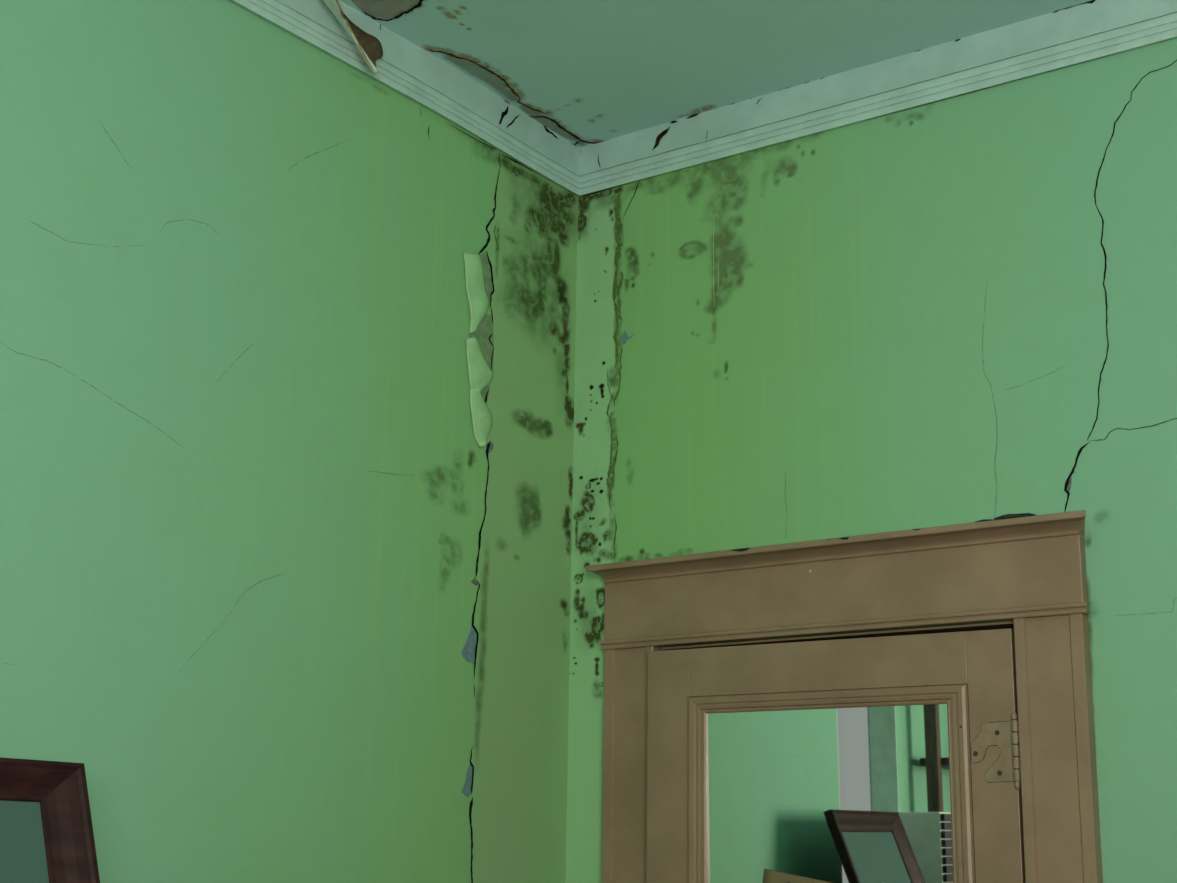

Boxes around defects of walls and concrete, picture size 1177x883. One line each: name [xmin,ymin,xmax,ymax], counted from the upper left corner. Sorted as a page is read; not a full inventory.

spalling [351,0,424,21]
peeling [463,251,494,453]
damp [503,160,622,436]
damp [606,228,638,333]
damp [681,167,744,329]
crack [1064,60,1177,512]
crack [472,441,491,695]
mould [522,490,541,528]
mould [561,469,613,687]
crack [467,746,475,883]